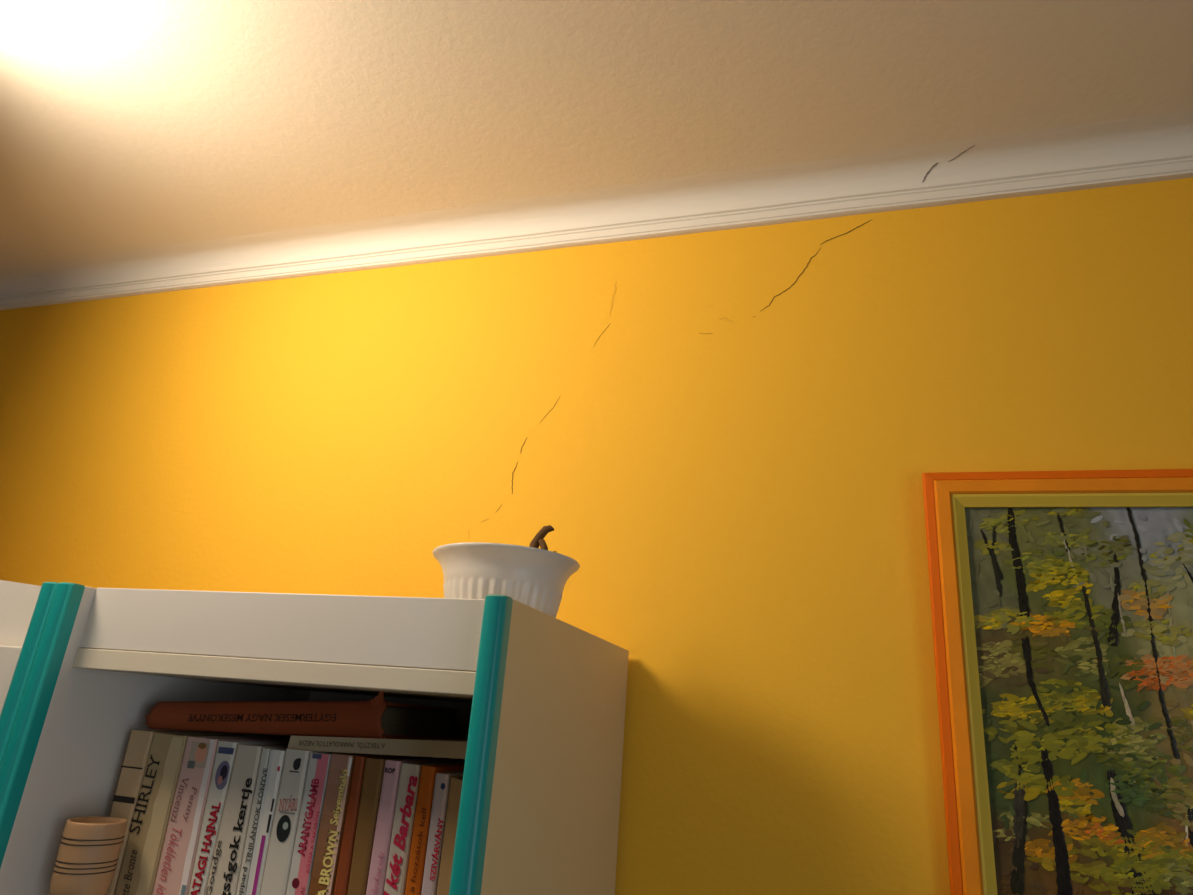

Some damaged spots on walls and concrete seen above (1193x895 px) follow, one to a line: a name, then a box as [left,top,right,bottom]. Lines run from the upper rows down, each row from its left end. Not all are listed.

crack [594,283,616,346]
crack [699,219,873,334]
crack [468,395,561,540]